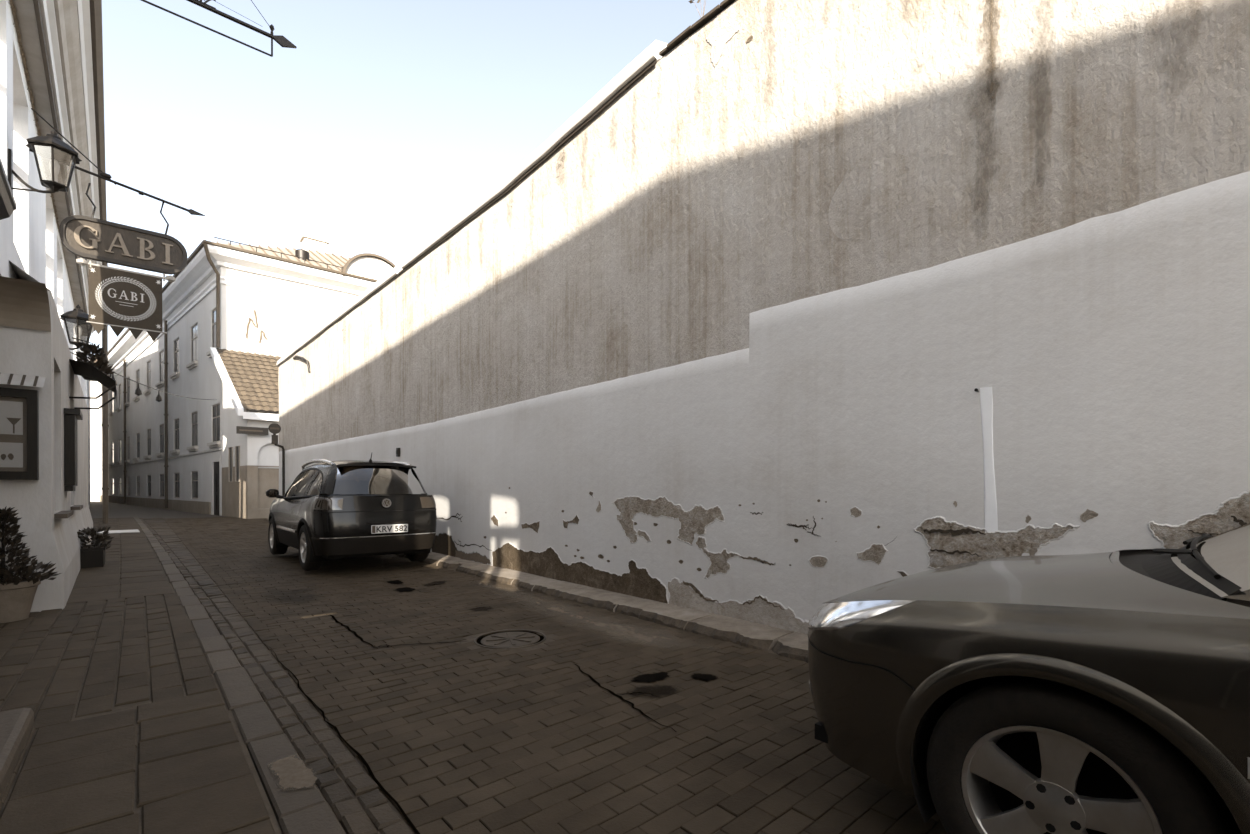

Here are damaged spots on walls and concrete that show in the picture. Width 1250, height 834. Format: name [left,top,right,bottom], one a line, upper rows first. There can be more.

water stain [972,0,1000,163]
peeling [484,491,809,635]
peeling [808,555,829,568]
peeling [850,506,862,518]
peeling [856,543,888,566]
spalling [914,501,1098,569]
spalling [1148,489,1250,549]
crack [575,664,676,732]